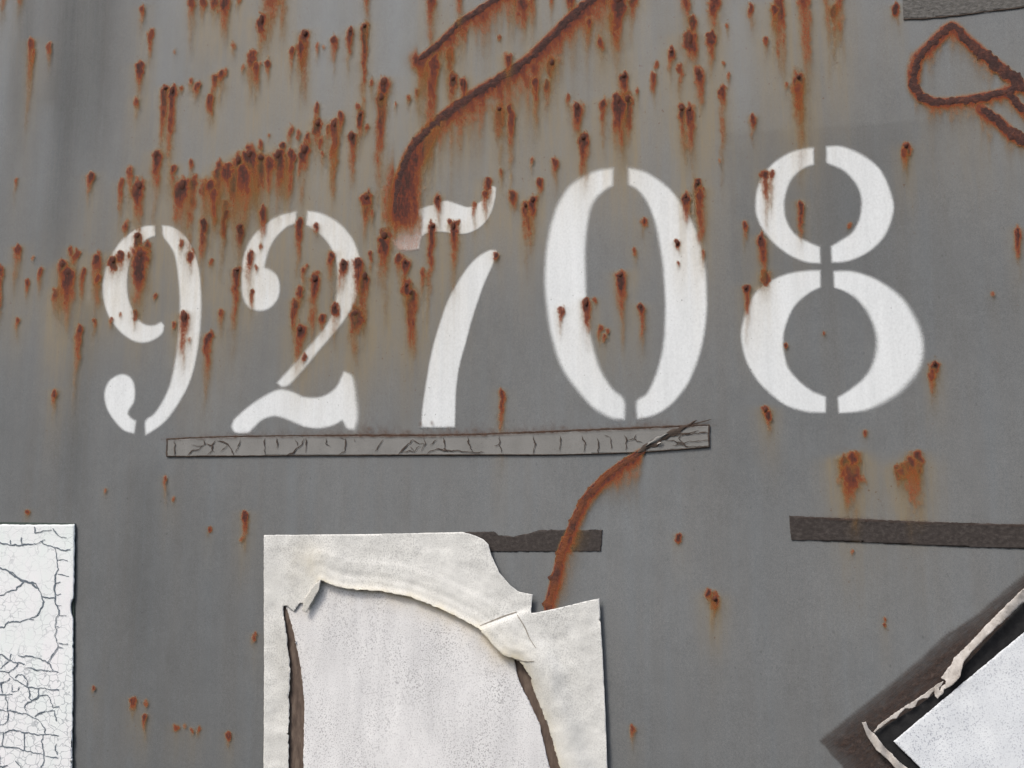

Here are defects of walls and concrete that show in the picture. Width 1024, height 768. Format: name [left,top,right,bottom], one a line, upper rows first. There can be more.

corrosion [598,0,730,148]
corrosion [763,0,812,133]
corrosion [907,21,1024,147]
corrosion [51,0,638,375]
corrosion [615,269,645,336]
corrosion [681,178,706,259]
corrosion [742,221,771,314]
corrosion [759,169,775,201]
crack [174,436,502,455]
corrosion [542,450,646,611]
corrosion [837,450,865,504]
crack [0,527,70,768]